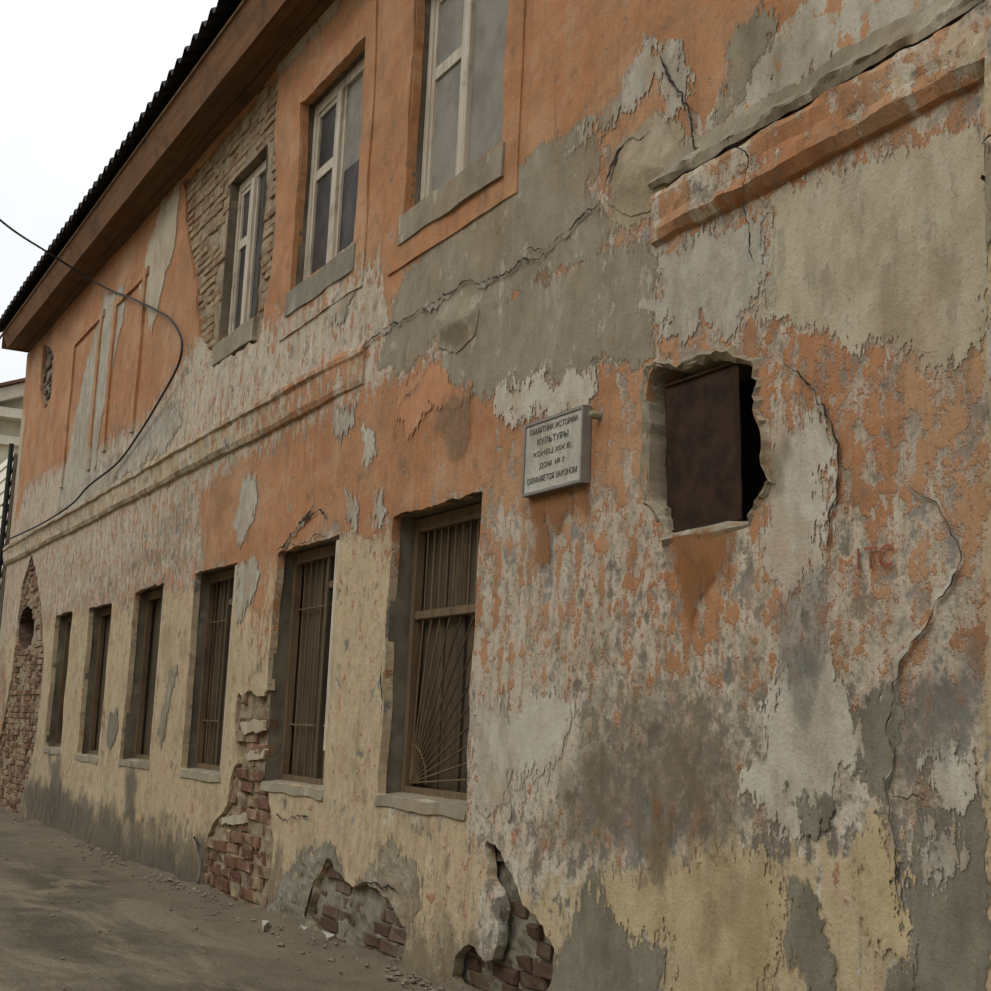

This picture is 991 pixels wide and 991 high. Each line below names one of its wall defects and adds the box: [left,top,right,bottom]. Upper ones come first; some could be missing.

peeling [55,283,184,516]
flaking render [139,0,340,357]
crack [364,132,649,347]
peeling [563,32,695,159]
crack [658,50,758,268]
peeling [633,120,991,615]
crack [784,364,843,547]
peeling [706,0,935,130]
flaking render [0,556,44,814]
flaking render [203,690,407,963]
peeling [462,626,991,991]
crack [885,485,968,909]